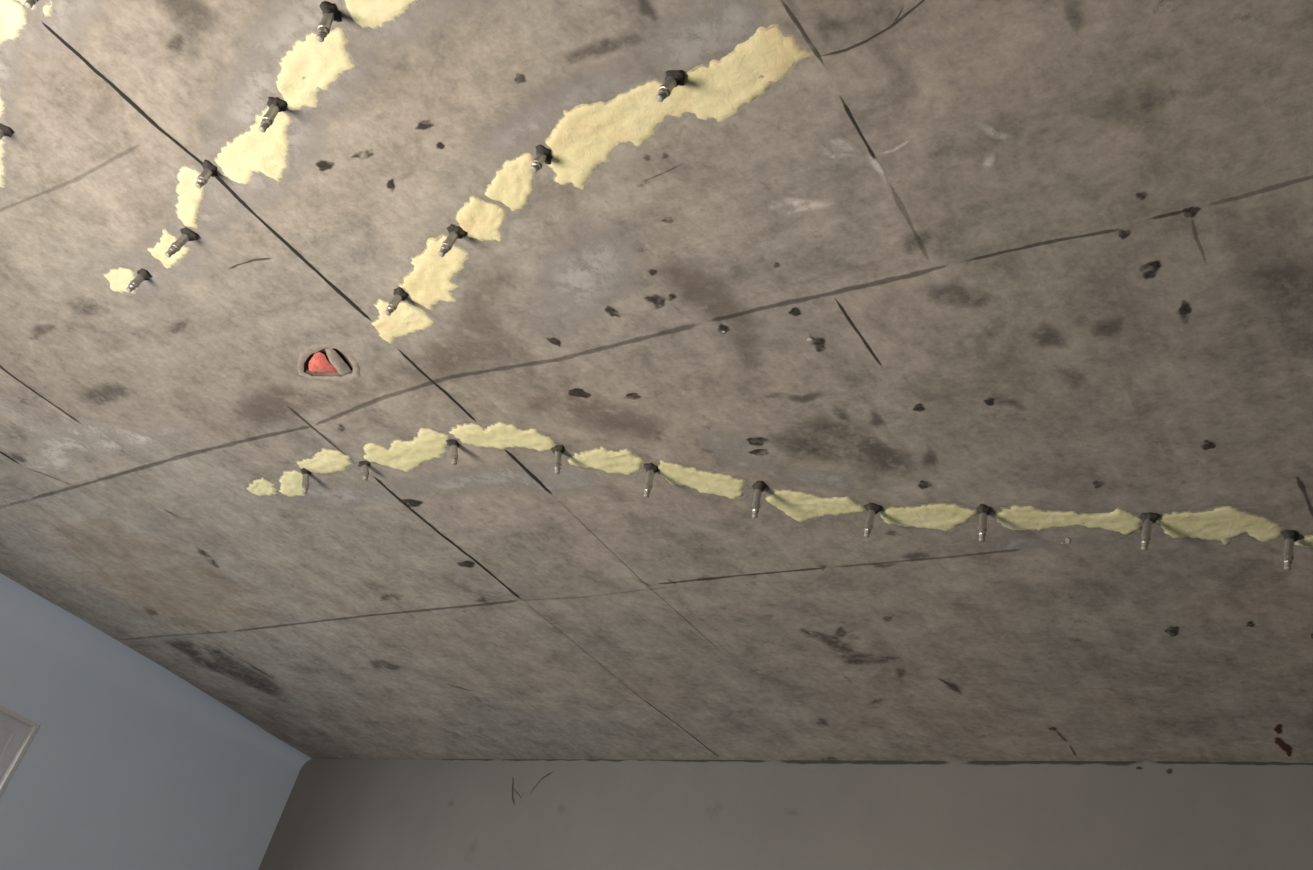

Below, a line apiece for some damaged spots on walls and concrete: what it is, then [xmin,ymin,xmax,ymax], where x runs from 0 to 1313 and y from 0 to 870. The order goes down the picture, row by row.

crack [0,0,54,46]
crack [0,88,8,188]
crack [101,0,419,295]
crack [371,0,924,344]
crack [246,421,1313,549]